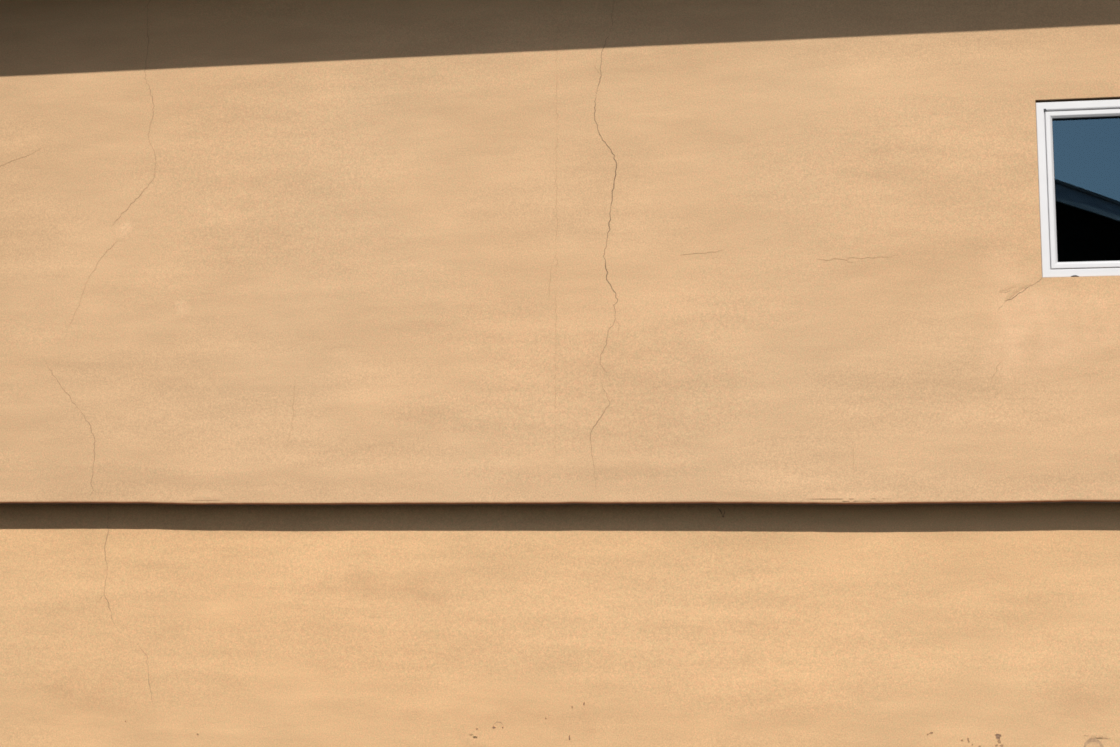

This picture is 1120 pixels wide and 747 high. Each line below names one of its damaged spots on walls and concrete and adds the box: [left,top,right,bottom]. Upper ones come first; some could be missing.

crack [590,11,619,481]
crack [998,278,1042,312]